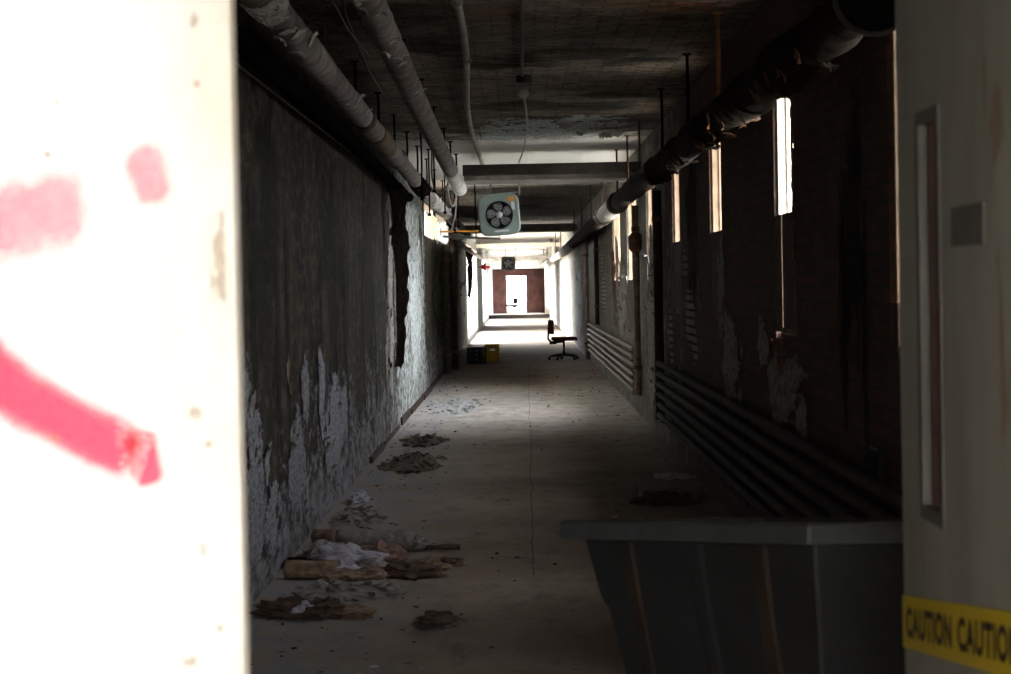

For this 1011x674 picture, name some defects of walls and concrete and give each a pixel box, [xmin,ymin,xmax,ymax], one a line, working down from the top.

peeling [384,186,445,410]
peeling [243,345,348,577]